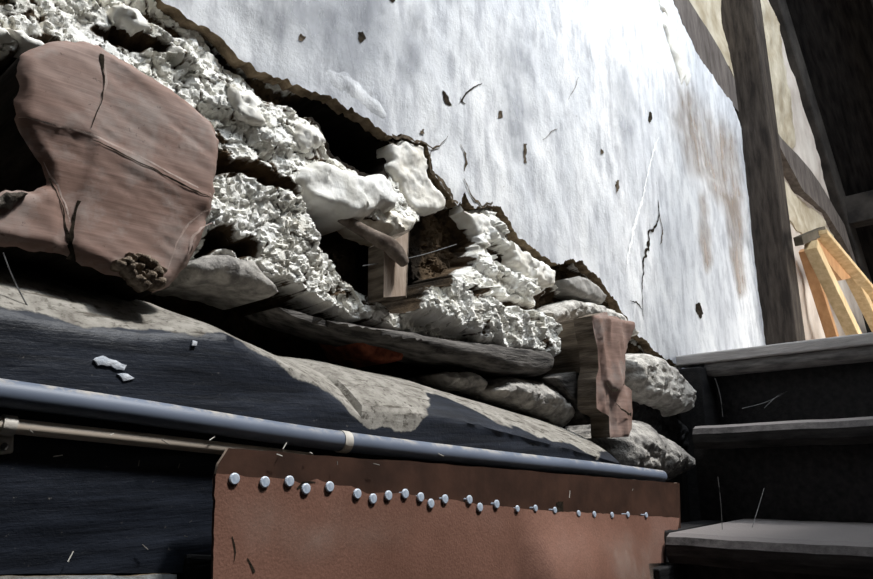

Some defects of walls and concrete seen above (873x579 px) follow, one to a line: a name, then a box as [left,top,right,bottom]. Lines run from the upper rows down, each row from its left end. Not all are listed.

peeling [658,0,691,86]
spalling [0,0,592,380]
crack [632,201,663,311]
spalling [625,339,650,355]